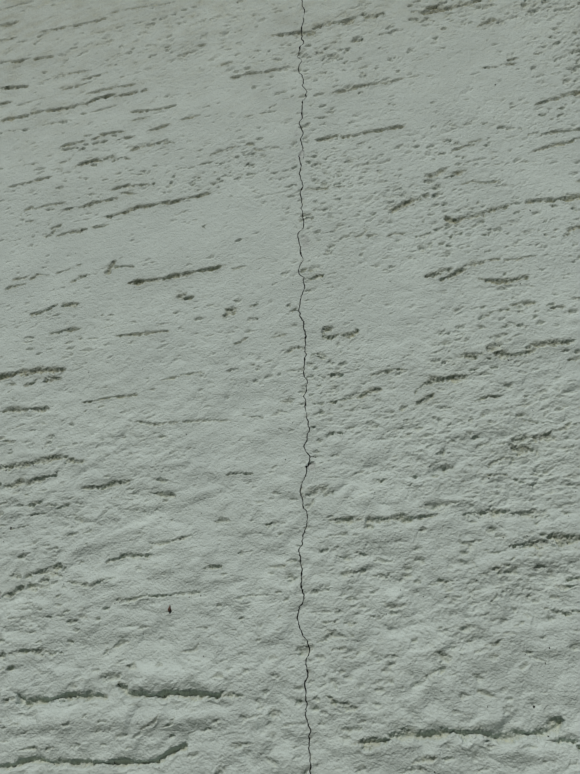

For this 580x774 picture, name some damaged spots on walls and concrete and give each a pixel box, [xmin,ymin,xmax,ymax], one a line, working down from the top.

crack [296,0,316,774]